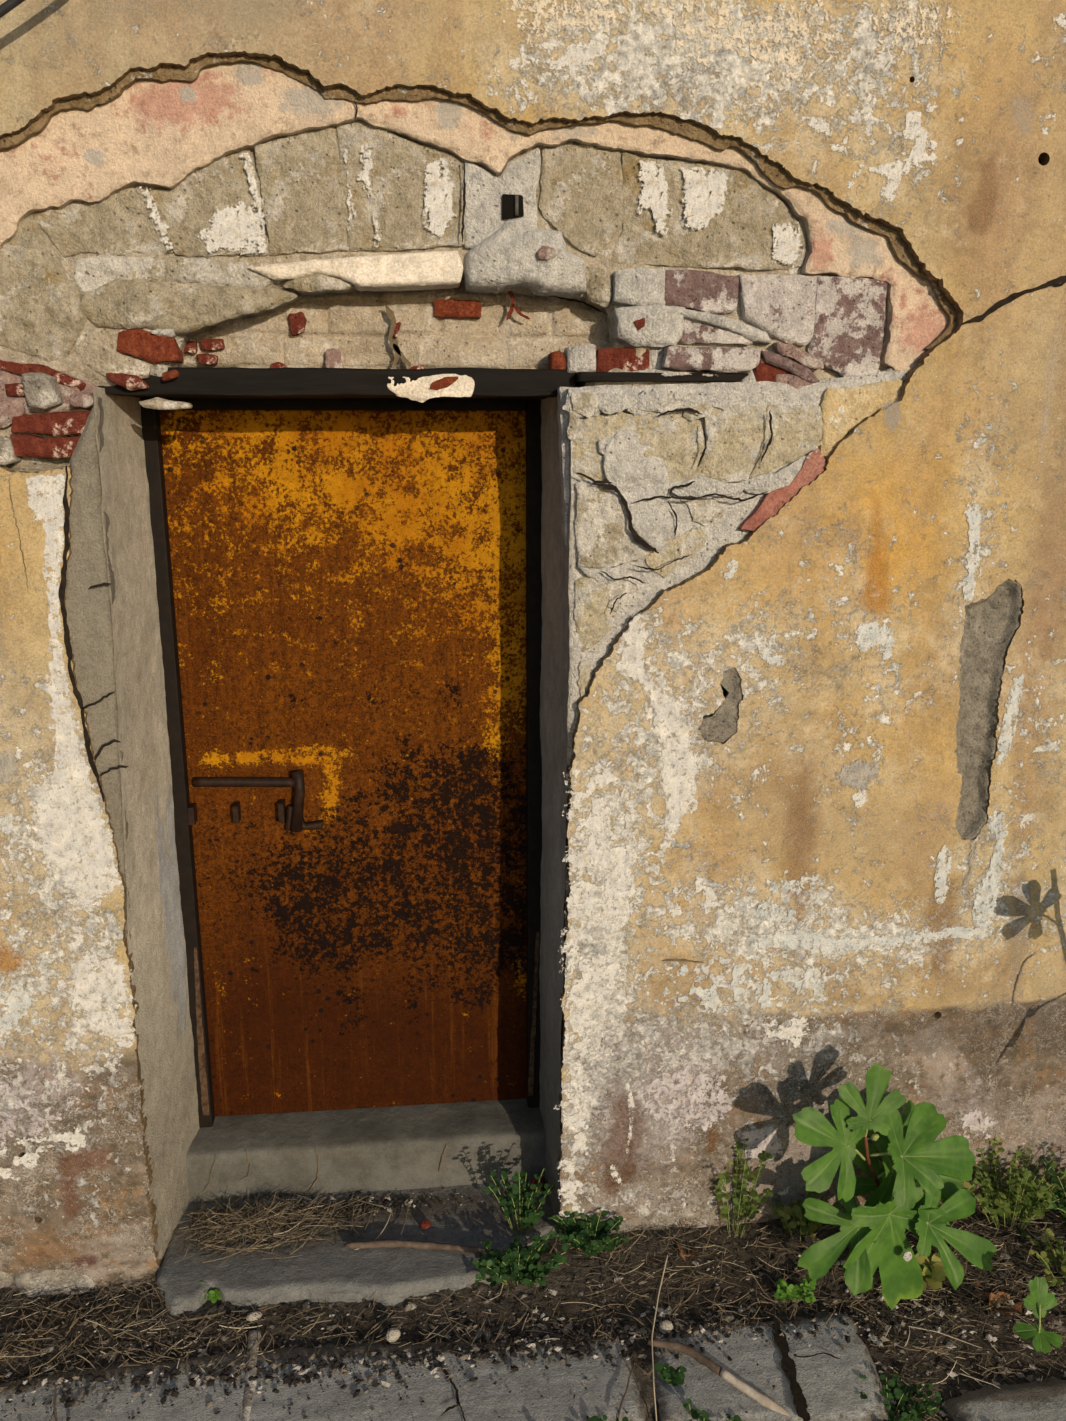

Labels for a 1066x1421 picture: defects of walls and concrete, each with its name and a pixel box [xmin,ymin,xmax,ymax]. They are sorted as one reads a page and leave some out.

peeling [502,0,856,106]
peeling [873,0,961,59]
crack [962,276,1066,325]
spalling [0,54,958,1219]
spalling [662,502,1025,1016]
leakage [762,1013,835,1051]
leakage [635,1059,784,1163]
leakage [959,1106,997,1140]